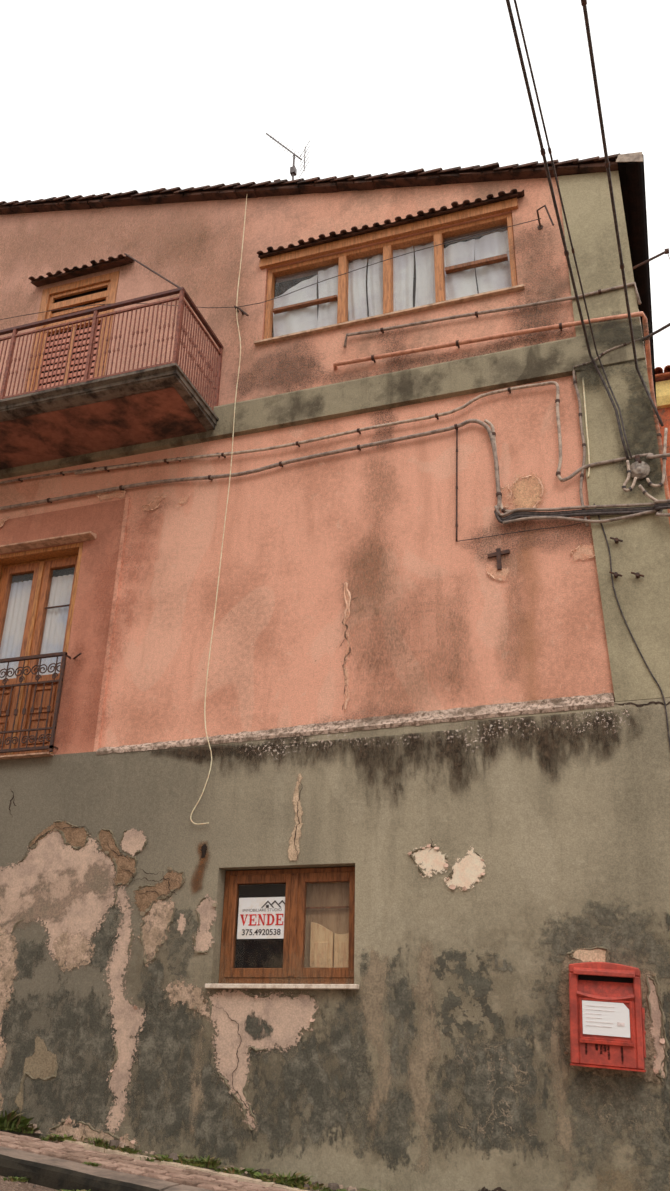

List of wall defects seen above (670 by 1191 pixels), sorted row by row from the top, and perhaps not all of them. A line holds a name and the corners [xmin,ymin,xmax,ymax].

flaking render [500,474,544,509]
crack [339,585,358,710]
leakage [151,697,637,796]
flaking render [0,820,218,972]
leakage [287,773,303,861]
flaking render [407,839,486,891]
flaking render [161,976,319,1131]
leakage [0,885,670,1191]
peeling [644,973,670,1082]